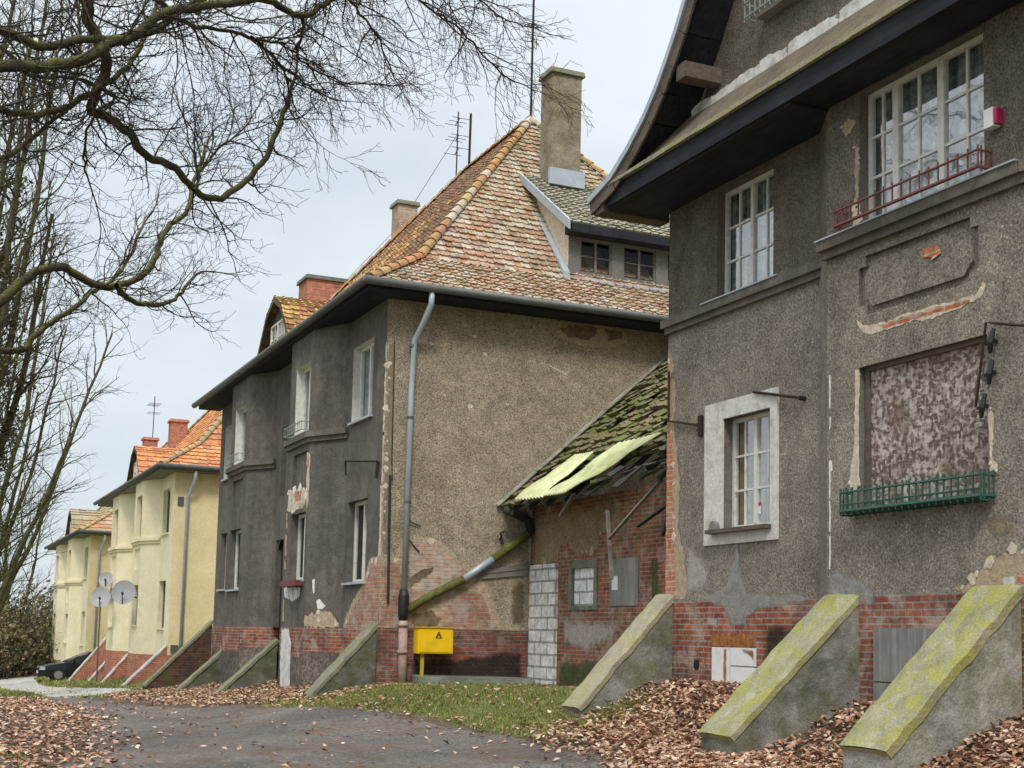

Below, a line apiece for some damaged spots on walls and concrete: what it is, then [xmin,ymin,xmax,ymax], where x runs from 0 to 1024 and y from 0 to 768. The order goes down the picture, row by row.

spalling [691,0,874,117]
flaking render [840,118,863,225]
flaking render [922,247,941,260]
flaking render [857,281,986,335]
flaking render [848,370,861,494]
flaking render [280,342,506,687]
flaking render [955,542,1024,593]
leakage [413,654,521,677]